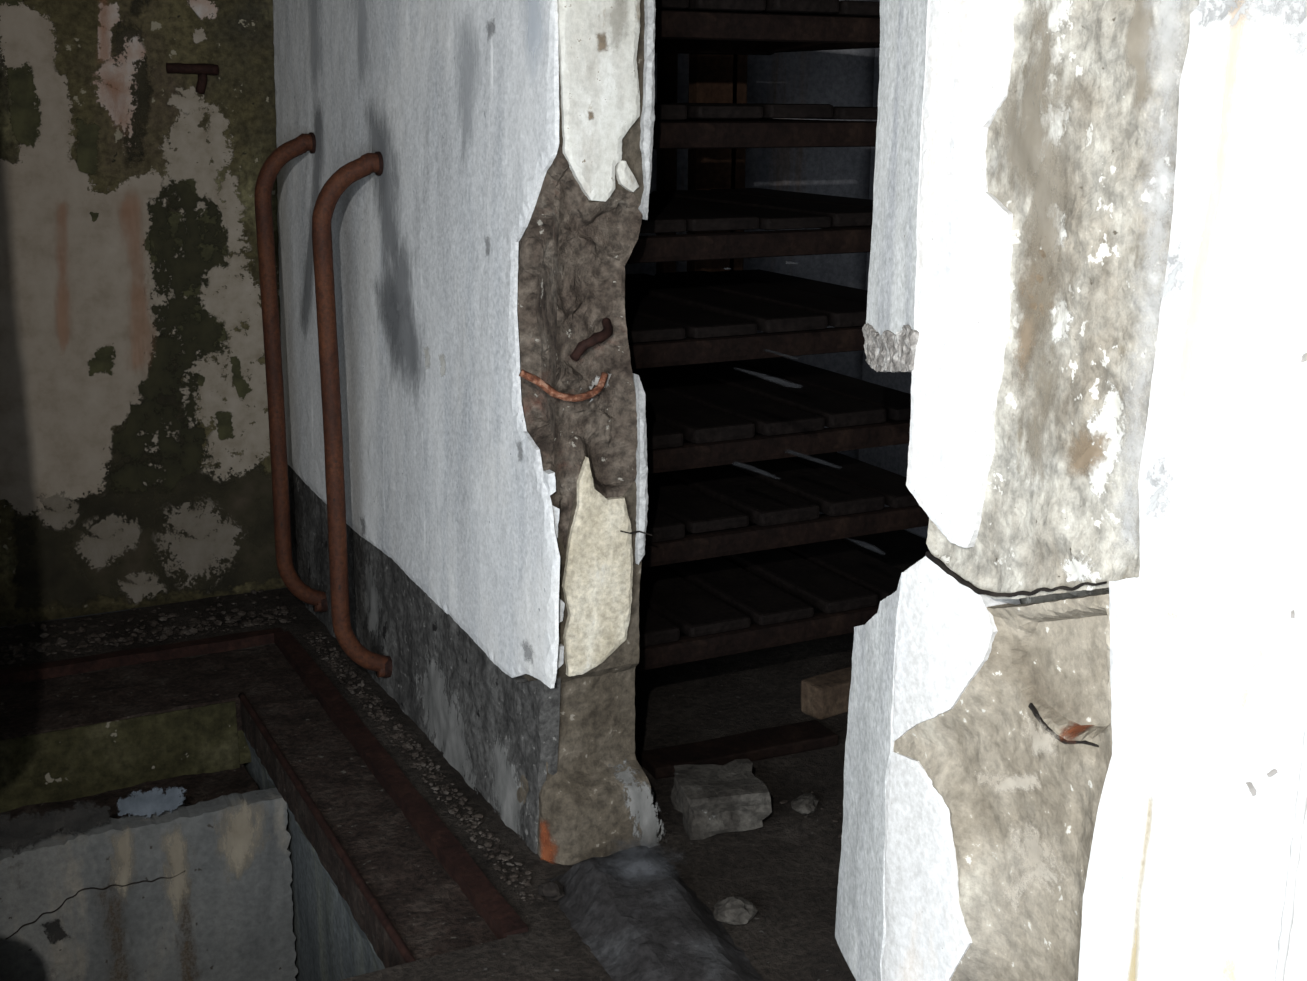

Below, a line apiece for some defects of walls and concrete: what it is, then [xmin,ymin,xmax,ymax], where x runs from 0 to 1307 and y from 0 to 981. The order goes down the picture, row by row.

spalling [517,145,643,549]
spalling [862,324,919,372]
crack [925,551,1107,597]
spalling [894,0,1199,981]